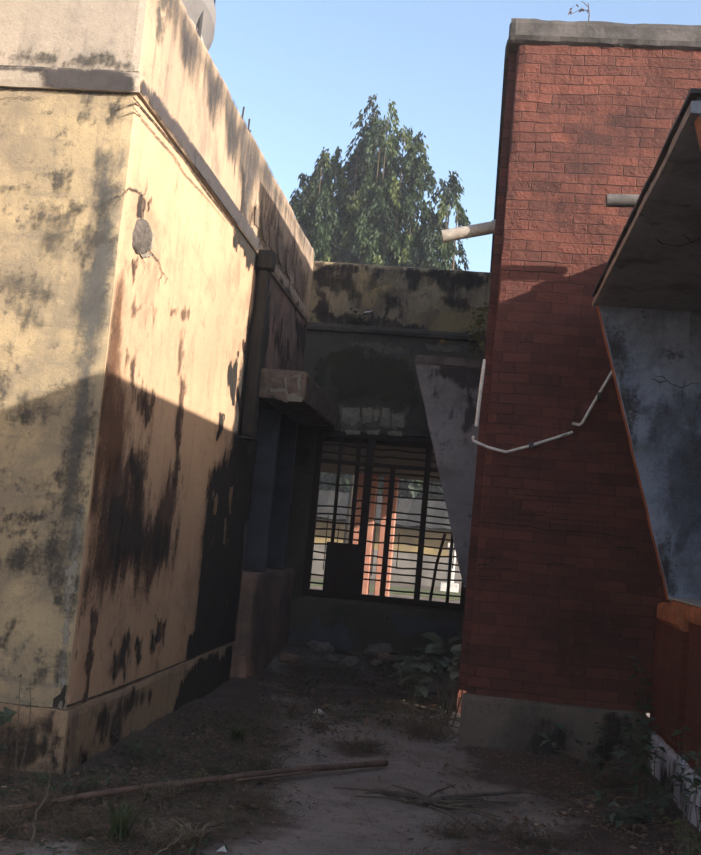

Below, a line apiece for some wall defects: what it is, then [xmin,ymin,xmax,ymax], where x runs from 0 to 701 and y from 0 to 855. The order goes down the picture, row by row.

water stain [0,152,185,746]
crack [0,87,298,286]
water stain [21,0,291,278]
water stain [174,294,271,711]
water stain [273,262,432,360]
water stain [401,268,490,311]